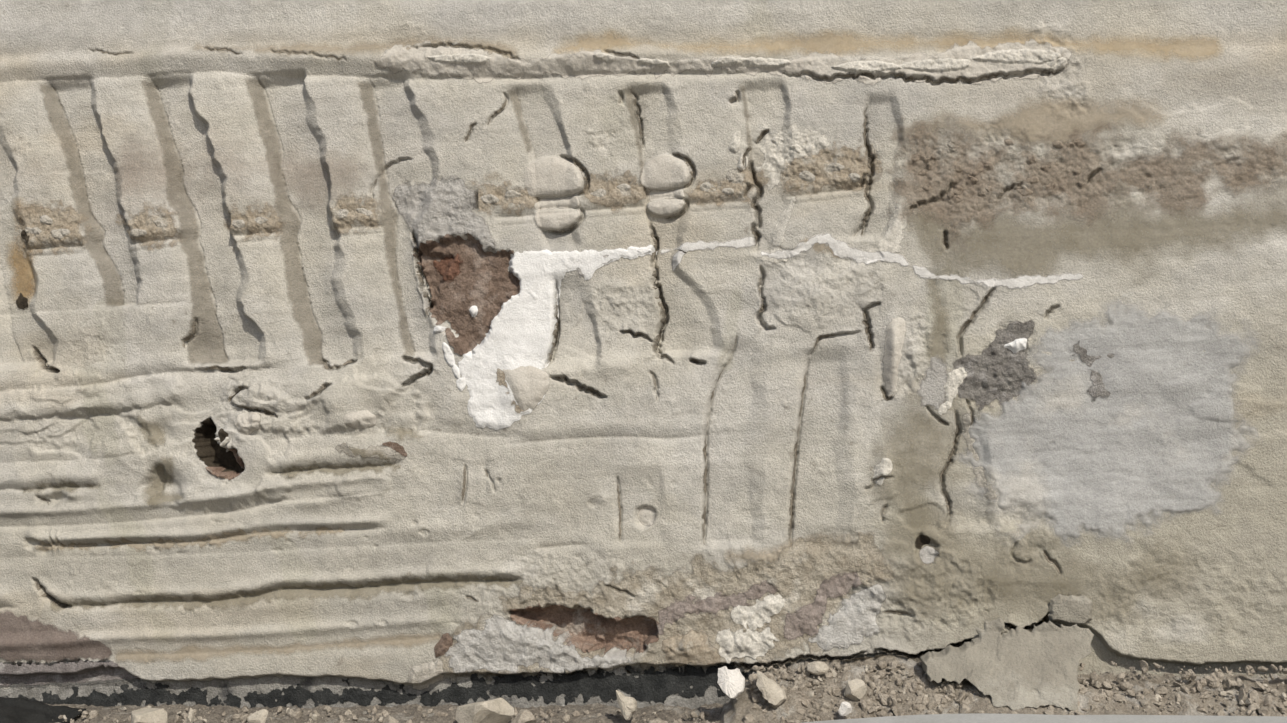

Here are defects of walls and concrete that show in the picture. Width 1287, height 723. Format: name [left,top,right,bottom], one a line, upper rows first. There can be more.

crack [634,98,643,143]
crack [675,154,695,214]
crack [742,130,769,244]
spalling [688,122,1287,234]
spalling [330,176,538,392]
crack [621,226,723,399]
crack [958,293,990,337]
crack [701,432,709,538]
crack [937,404,973,509]
spalling [918,320,1036,500]
spalling [408,532,894,699]